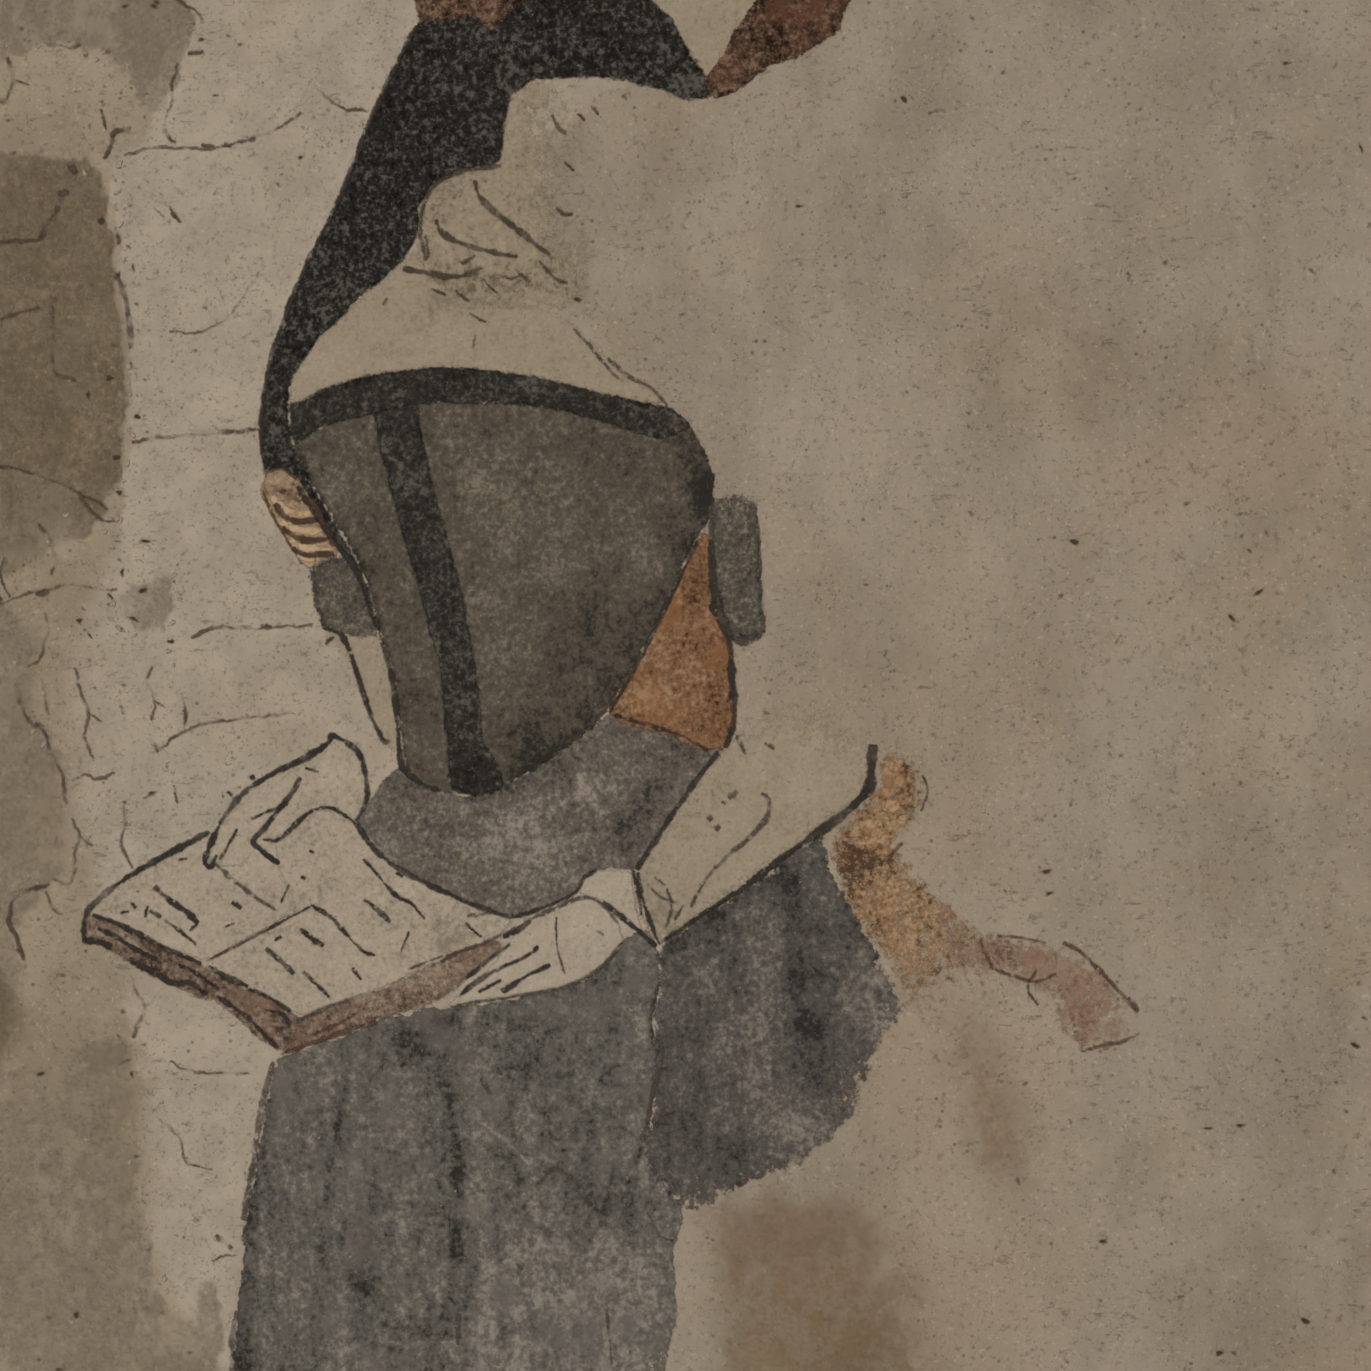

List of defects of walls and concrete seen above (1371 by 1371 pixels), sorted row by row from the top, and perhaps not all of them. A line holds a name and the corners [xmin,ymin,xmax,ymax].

crack [0,50,302,244]
crack [339,104,366,112]
crack [114,227,133,333]
spalling [0,151,148,546]
crack [224,427,259,435]
crack [0,568,60,604]
spalling [107,572,183,668]
crack [191,623,313,638]
crack [147,666,232,753]
crack [24,667,132,868]
crack [6,883,58,960]
water stain [741,1228,903,1371]